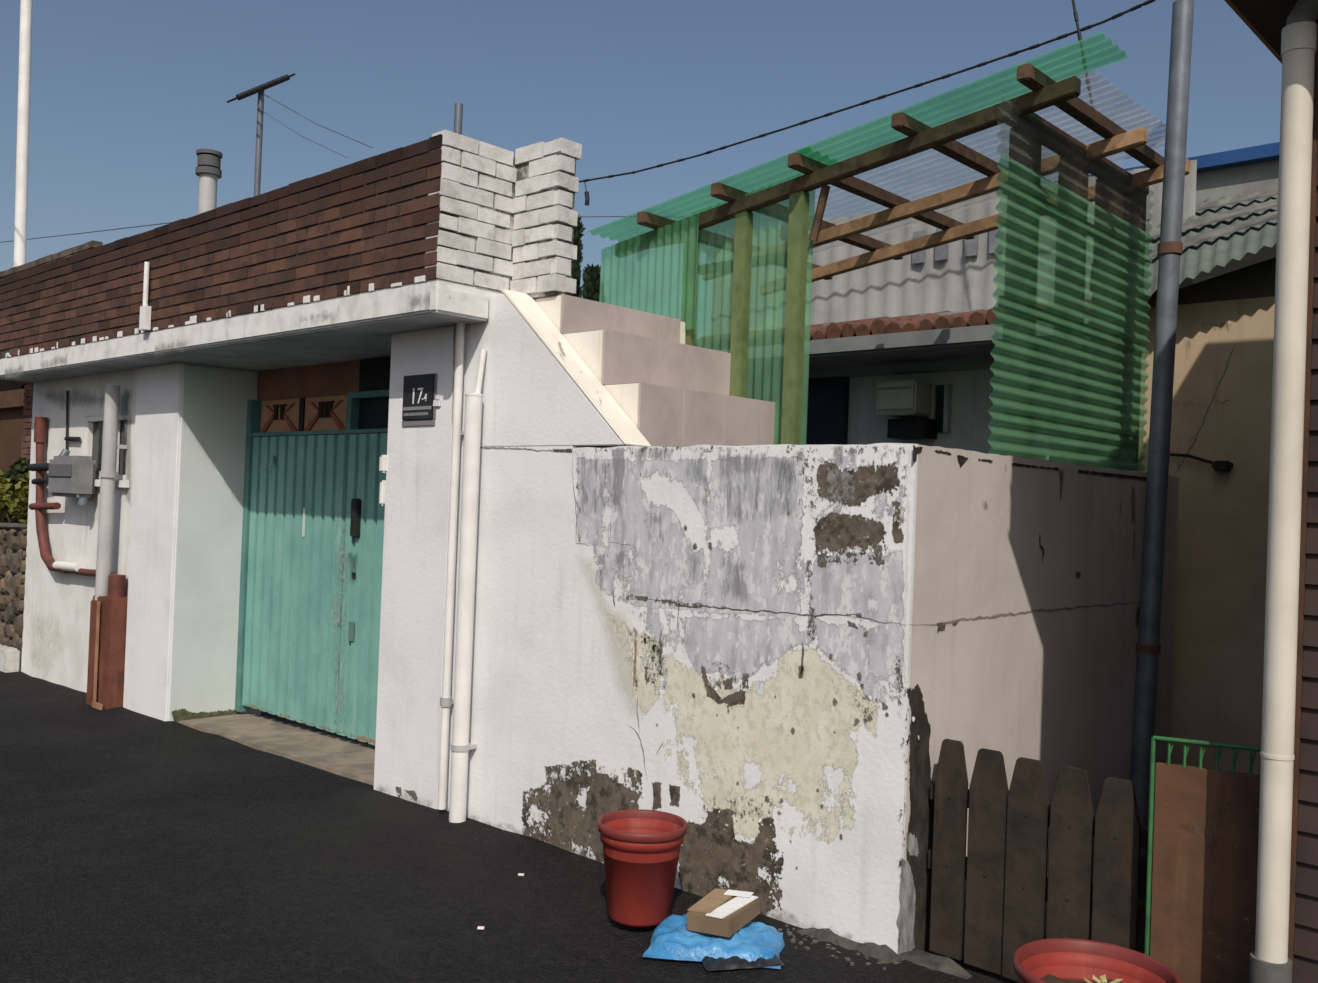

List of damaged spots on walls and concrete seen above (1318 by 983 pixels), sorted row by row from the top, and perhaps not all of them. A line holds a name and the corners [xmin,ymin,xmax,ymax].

spalling [1012,463,1058,471]
spalling [1078,470,1147,481]
crack [626,560,1139,678]
peeling [521,445,993,956]